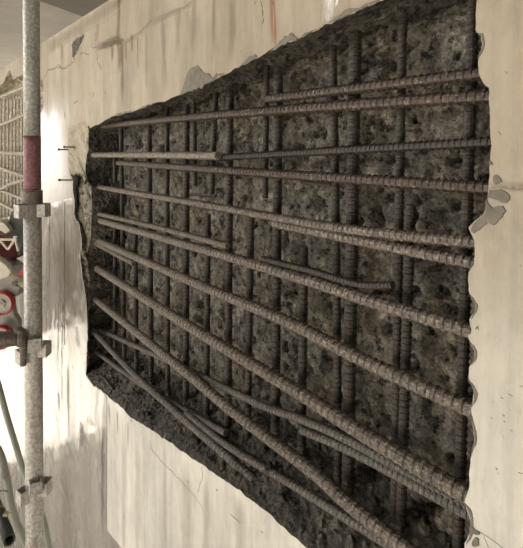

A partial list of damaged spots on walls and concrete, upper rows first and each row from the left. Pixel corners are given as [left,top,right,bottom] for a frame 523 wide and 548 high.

crack [43,34,101,81]
spalling [403,188,462,235]
spalling [260,221,478,325]
spalling [356,304,393,365]
spalling [392,315,402,368]
spalling [400,318,413,374]
spalling [410,321,458,393]
spalling [455,335,477,398]
crack [150,442,204,512]
spalling [408,391,456,476]
spalling [453,411,468,483]
spalling [466,417,474,483]